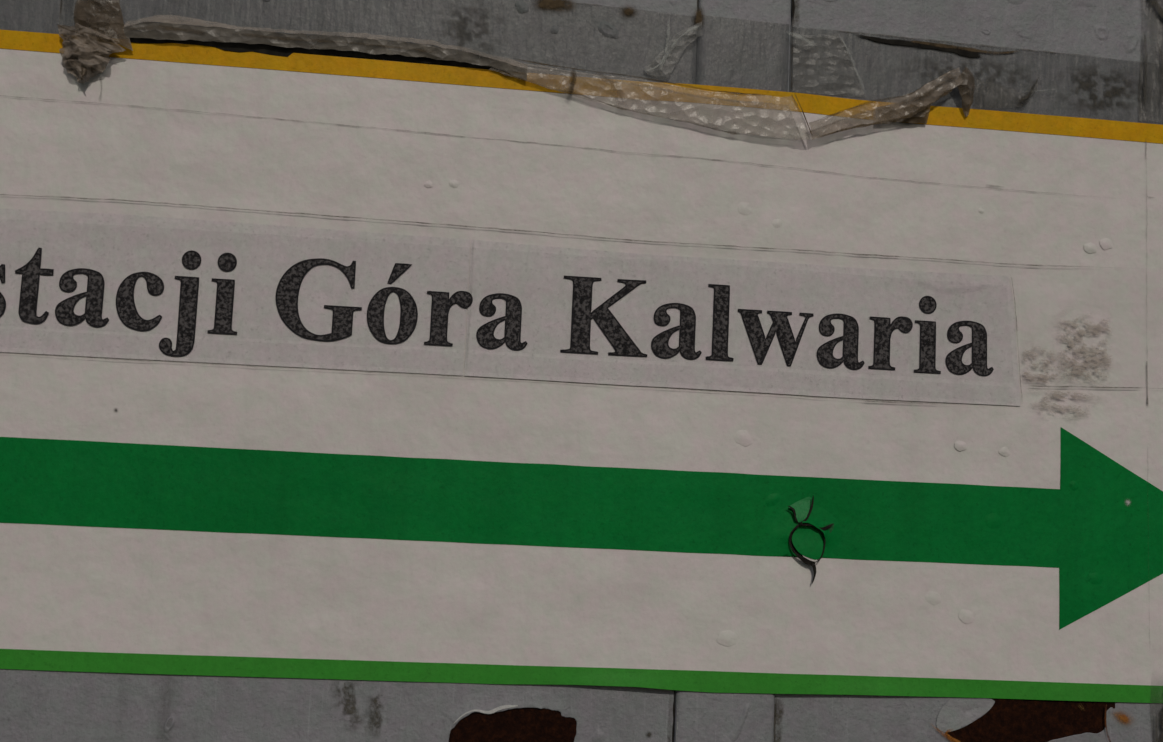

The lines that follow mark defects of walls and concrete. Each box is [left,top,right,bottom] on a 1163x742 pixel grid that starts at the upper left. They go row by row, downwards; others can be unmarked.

corrosion [431,689,593,742]
corrosion [930,698,1131,742]